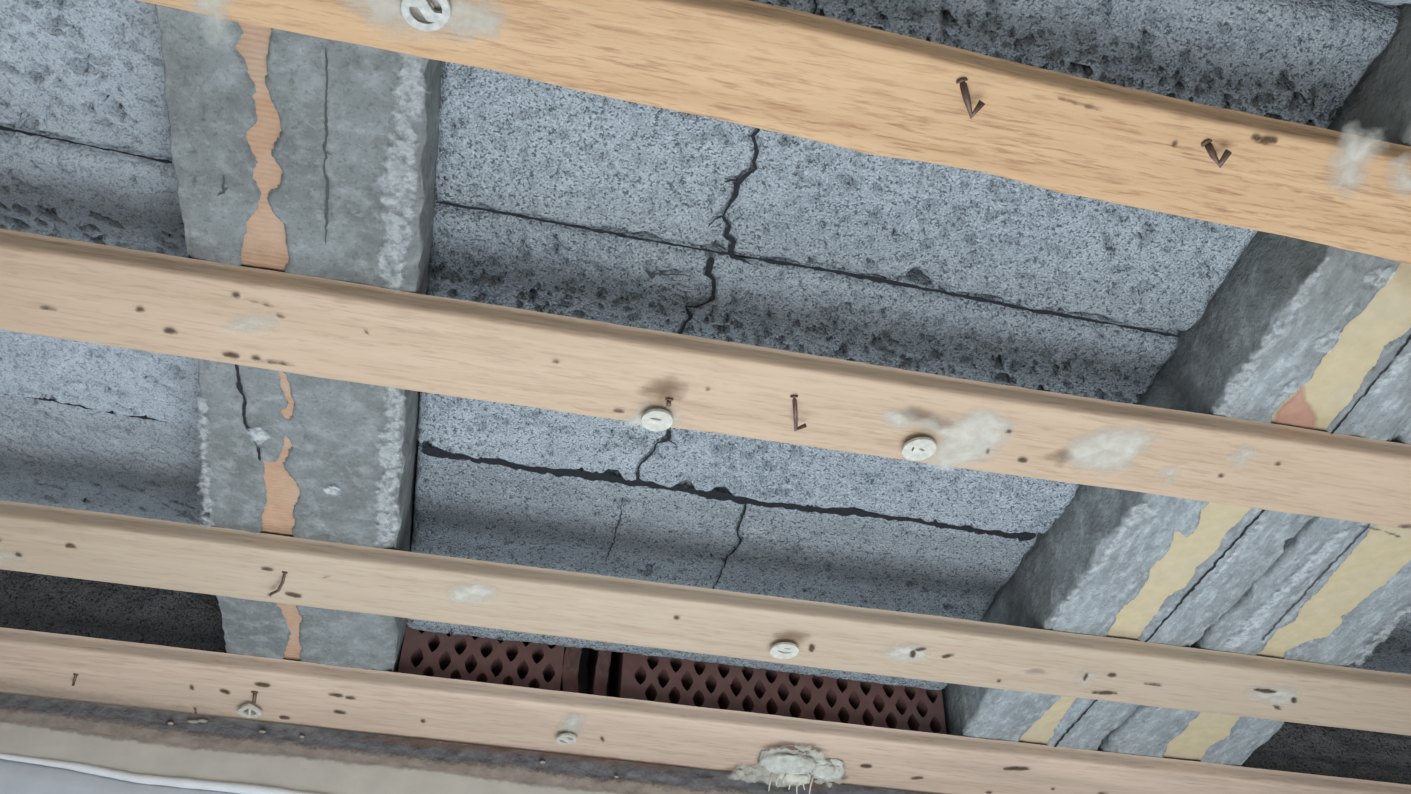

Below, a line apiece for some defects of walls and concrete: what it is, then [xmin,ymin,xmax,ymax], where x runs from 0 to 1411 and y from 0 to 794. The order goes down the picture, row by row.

crack [323,49,334,244]
crack [645,128,760,334]
crack [235,364,261,461]
crack [605,427,676,562]
crack [713,498,749,589]